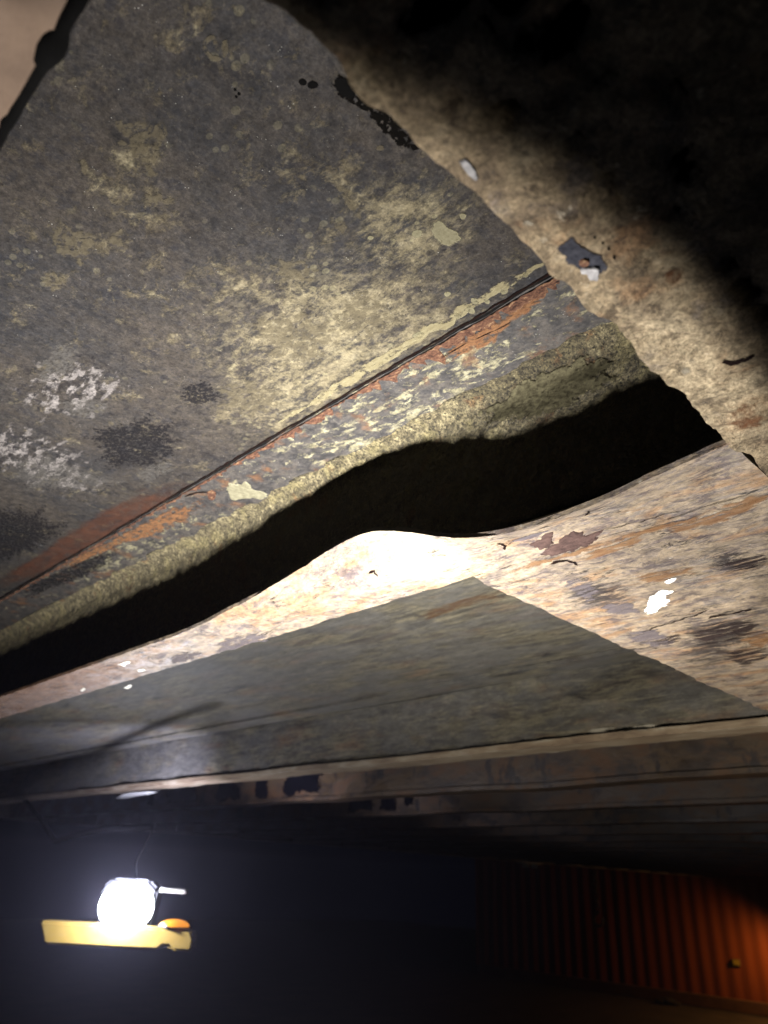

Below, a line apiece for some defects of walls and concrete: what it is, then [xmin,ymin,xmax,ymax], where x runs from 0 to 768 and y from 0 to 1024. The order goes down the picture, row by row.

spalling [557,236,616,281]
rust [445,298,540,359]
rust [478,355,616,426]
peeling [226,481,268,501]
rust [62,490,216,568]
peeling [721,555,768,572]
peeling [565,578,641,615]
peeling [171,651,201,664]
peeling [217,633,269,653]
peeling [628,619,767,669]